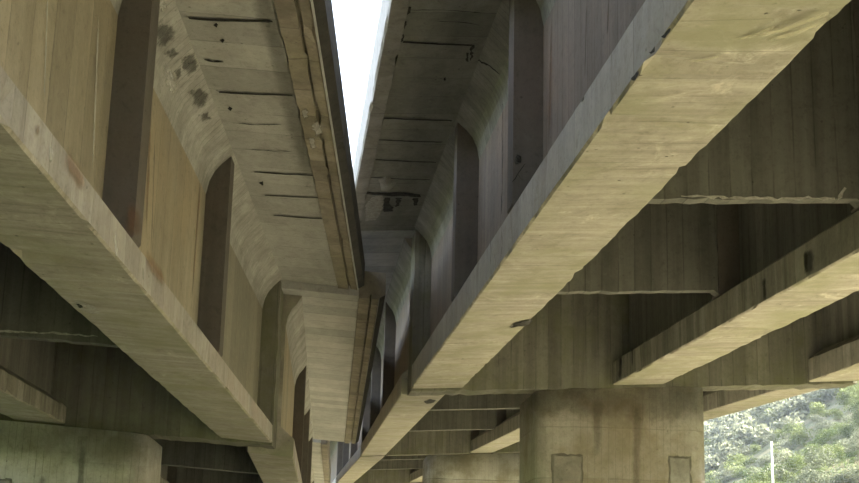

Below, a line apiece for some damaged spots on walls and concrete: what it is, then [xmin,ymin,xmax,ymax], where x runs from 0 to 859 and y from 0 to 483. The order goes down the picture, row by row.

spalling [365,192,421,221]